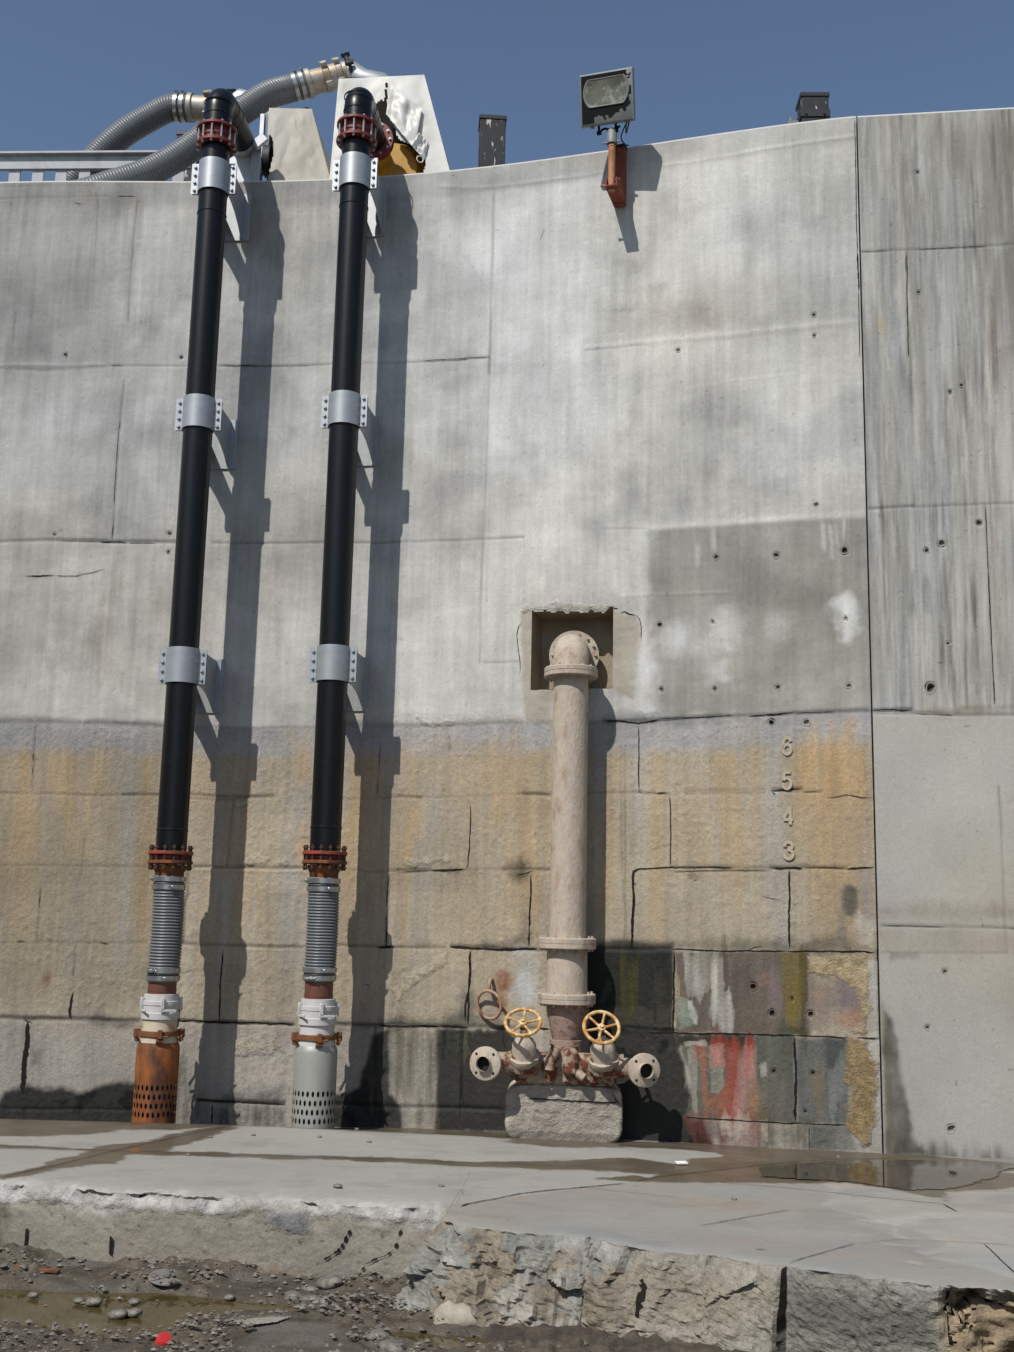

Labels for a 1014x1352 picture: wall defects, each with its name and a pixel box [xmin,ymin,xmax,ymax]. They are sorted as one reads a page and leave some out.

leakage [595,242,871,735]
peeling [674,935,777,1116]
peeling [756,960,783,1020]
spalling [803,952,881,1148]
spalling [938,1291,1014,1352]